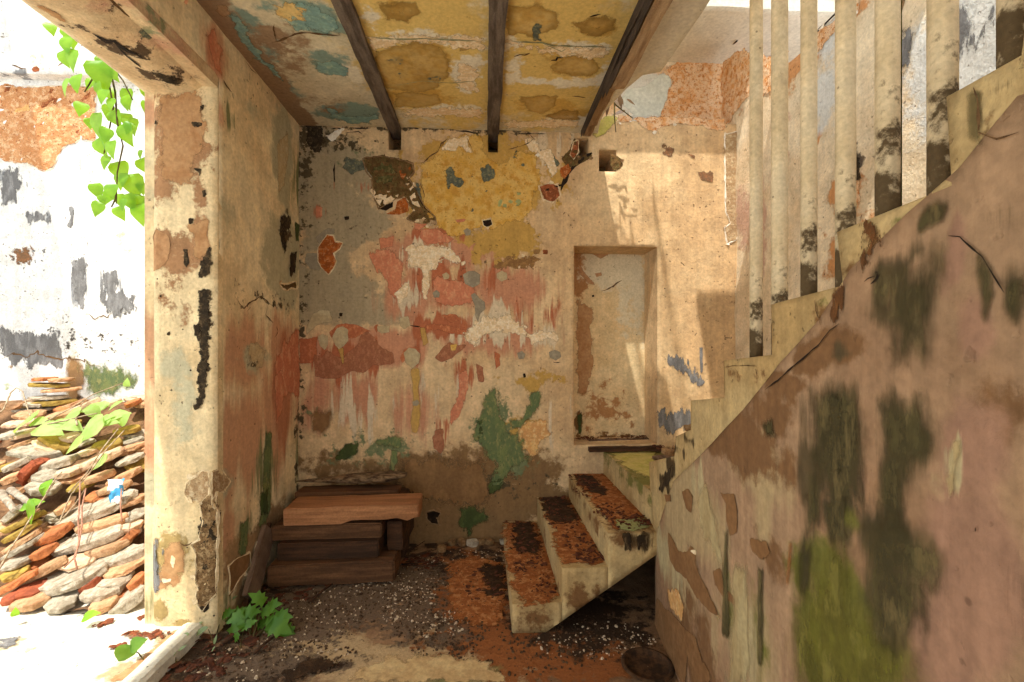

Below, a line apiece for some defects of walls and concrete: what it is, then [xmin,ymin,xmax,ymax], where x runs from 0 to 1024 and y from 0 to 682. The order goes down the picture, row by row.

flaking render [0,84,97,171]
water stain [152,73,207,185]
peeling [362,133,593,244]
spalling [279,215,343,291]
crack [952,236,1004,292]
water stain [193,359,209,410]
peeling [275,313,419,423]
crack [765,304,837,390]
spalling [184,468,257,613]
water stain [375,387,541,537]
water stain [798,387,863,597]
water stain [864,393,941,652]